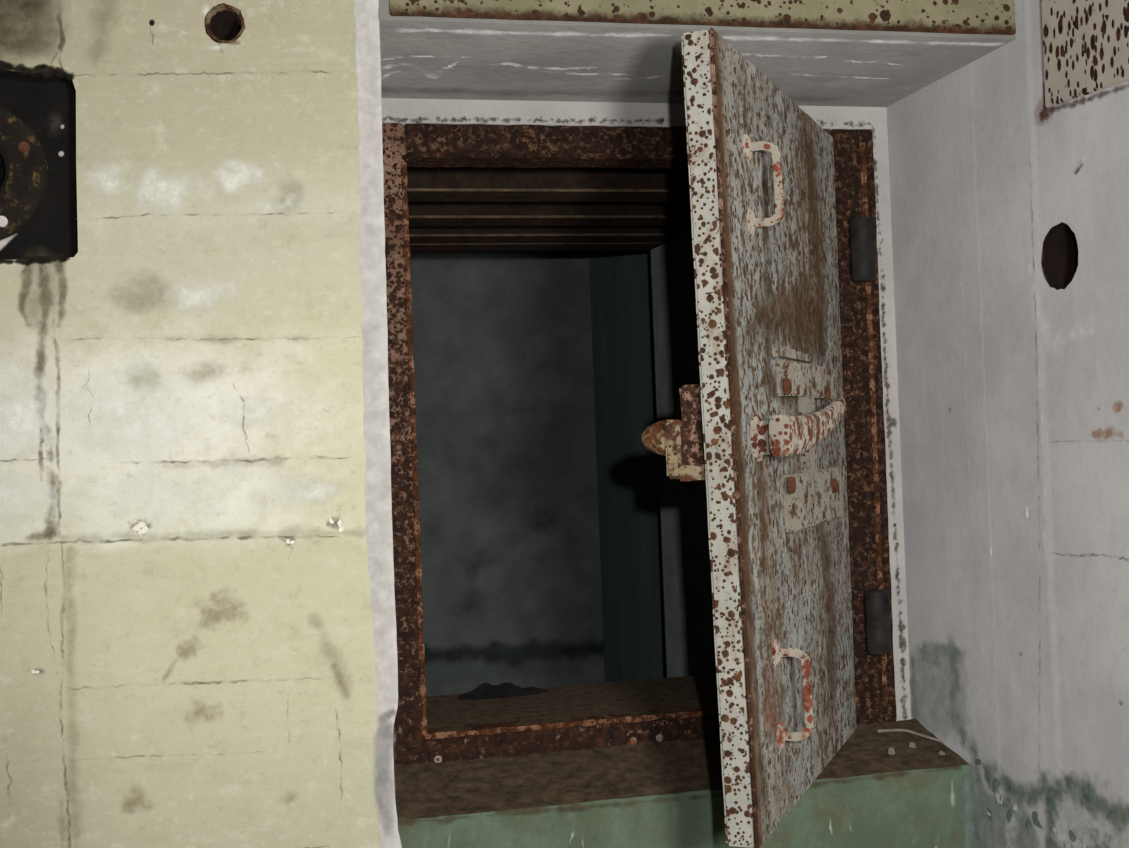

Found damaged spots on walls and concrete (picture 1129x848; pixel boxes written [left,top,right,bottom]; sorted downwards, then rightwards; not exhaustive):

damp [20,263,66,318]
corrosion [752,141,825,403]
damp [36,351,45,409]
corrosion [729,311,764,630]
corrosion [820,531,837,688]